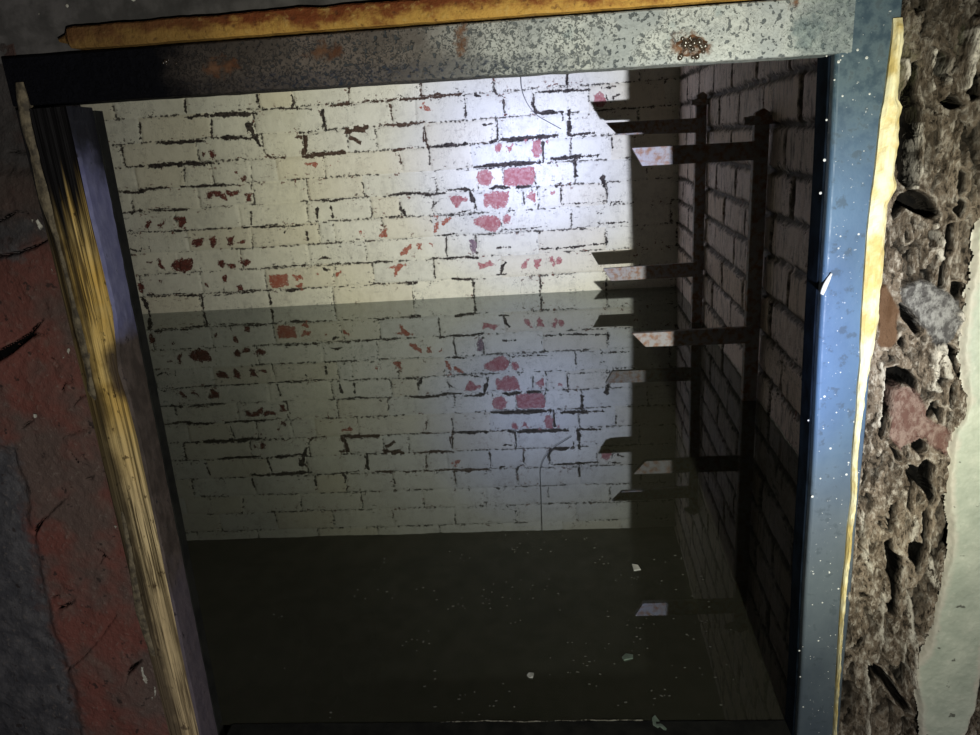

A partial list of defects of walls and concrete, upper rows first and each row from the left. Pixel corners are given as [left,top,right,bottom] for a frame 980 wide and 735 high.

corrosion [672,34,710,61]
peeling [206,171,254,202]
peeling [474,139,548,232]
peeling [144,216,187,230]
peeling [146,236,246,282]
peeling [217,259,251,292]
peeling [269,273,303,291]
crack [0,322,41,361]
flaking render [914,218,980,735]